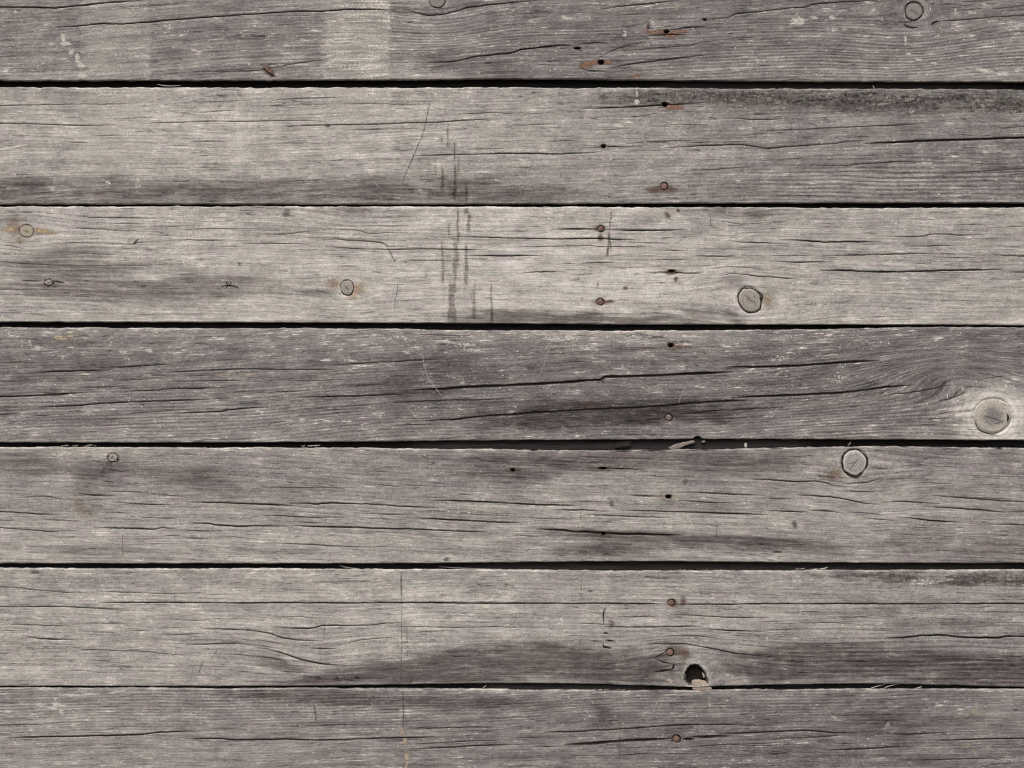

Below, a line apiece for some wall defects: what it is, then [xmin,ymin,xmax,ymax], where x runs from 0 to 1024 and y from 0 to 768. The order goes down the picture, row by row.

crack [0,0,537,27]
crack [5,216,1024,313]
crack [0,334,1005,426]
crack [0,587,1024,672]